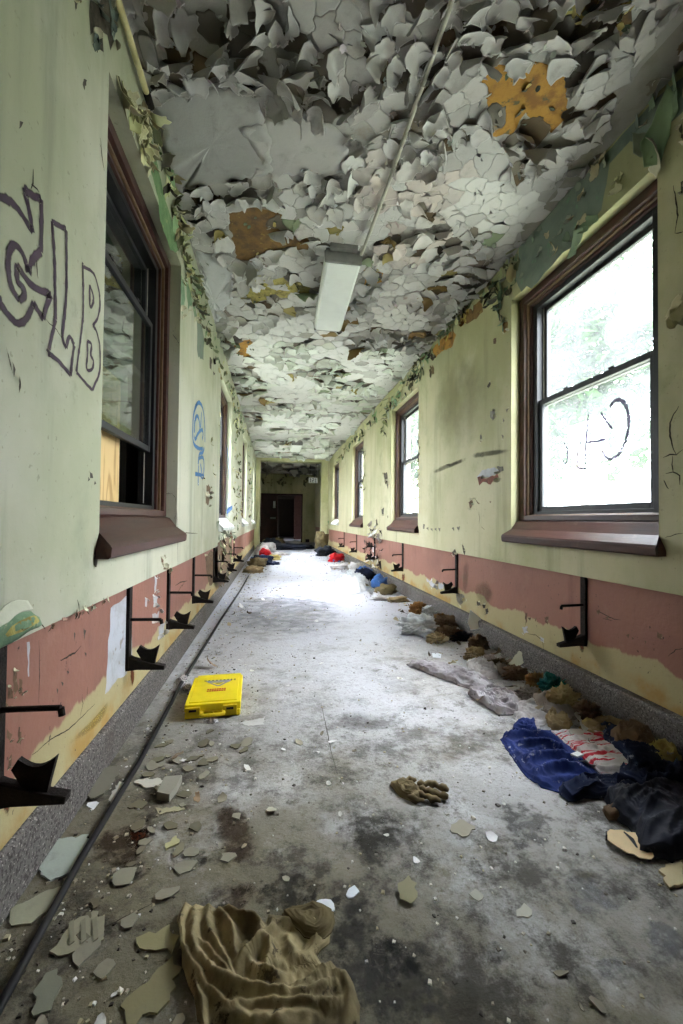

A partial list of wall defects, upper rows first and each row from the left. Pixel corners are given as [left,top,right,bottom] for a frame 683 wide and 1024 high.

peeling [74,0,683,588]
crack [663,406,683,489]
peeling [48,597,110,640]
peeling [145,554,173,640]
peeling [426,579,489,615]
peeling [6,642,30,707]